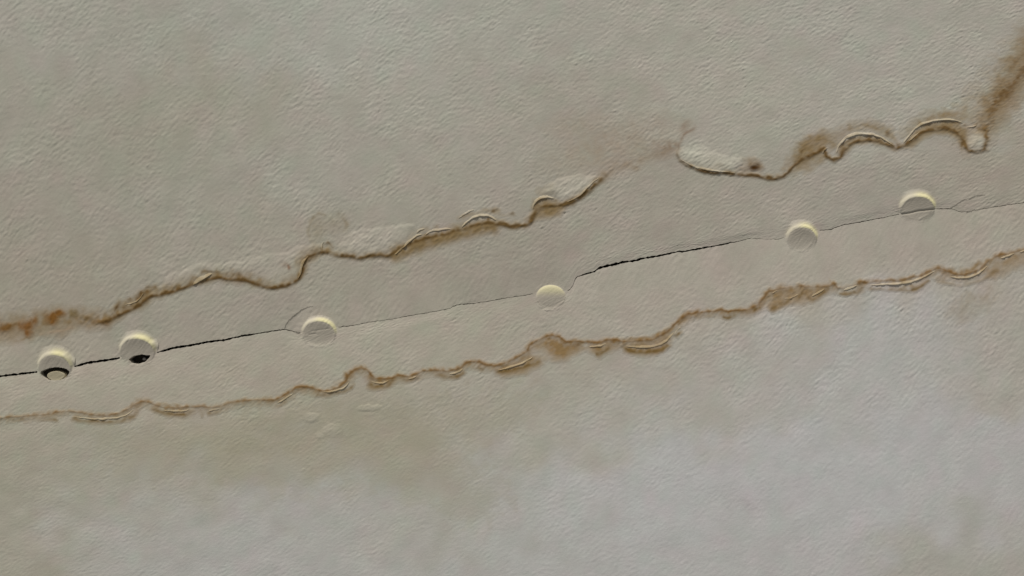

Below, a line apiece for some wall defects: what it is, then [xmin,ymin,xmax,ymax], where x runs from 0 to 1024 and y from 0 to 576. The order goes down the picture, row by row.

peeling [822,118,977,154]
damp [94,16,1024,326]
crack [940,195,1024,213]
peeling [395,210,496,254]
crack [820,214,898,231]
crack [568,237,784,291]
crack [341,294,530,327]
crack [159,306,313,352]
crack [0,370,37,378]
crack [76,357,120,367]